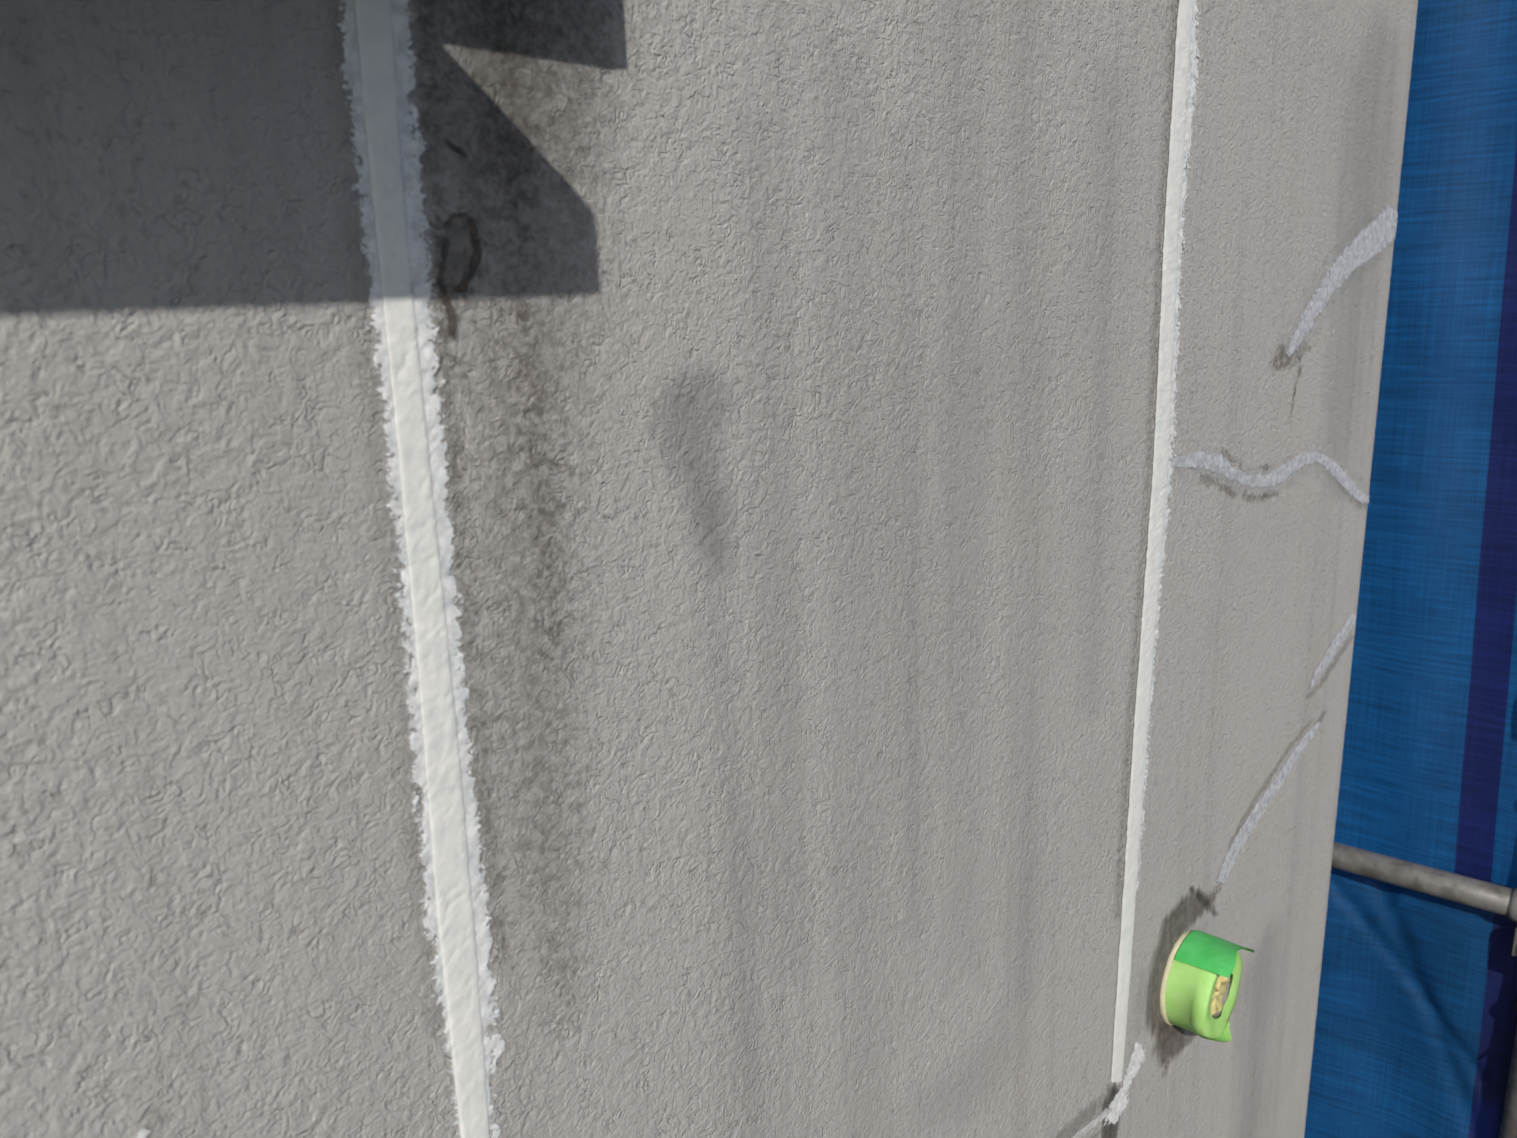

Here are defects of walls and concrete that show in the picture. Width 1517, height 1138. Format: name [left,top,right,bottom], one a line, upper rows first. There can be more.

crack [1287,205,1398,357]
crack [1169,451,1369,504]
crack [1216,614,1356,884]
crack [1071,1042,1146,1138]